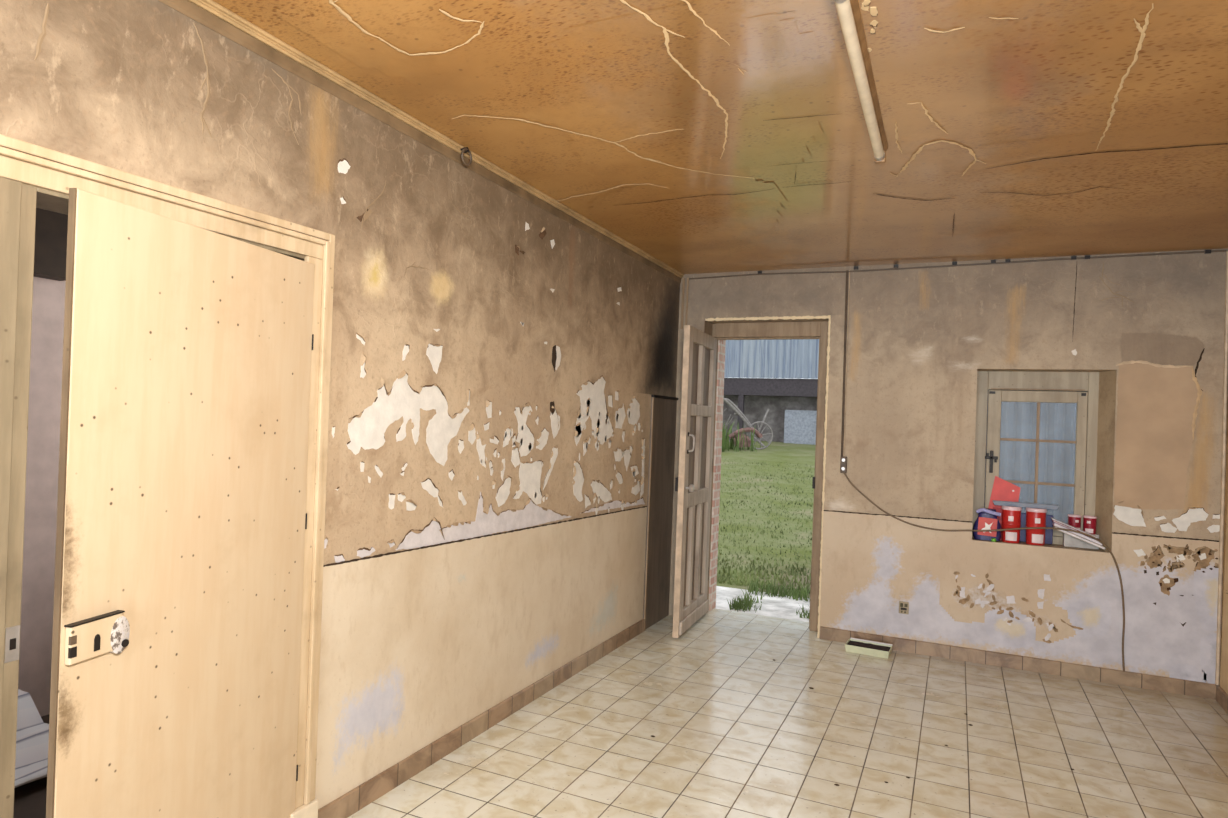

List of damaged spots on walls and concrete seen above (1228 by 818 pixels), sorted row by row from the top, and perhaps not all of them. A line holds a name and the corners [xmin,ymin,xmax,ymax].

crack [329,0,484,56]
crack [452,0,848,205]
crack [876,3,1228,237]
peeling [324,329,646,563]
spalling [939,568,1083,643]